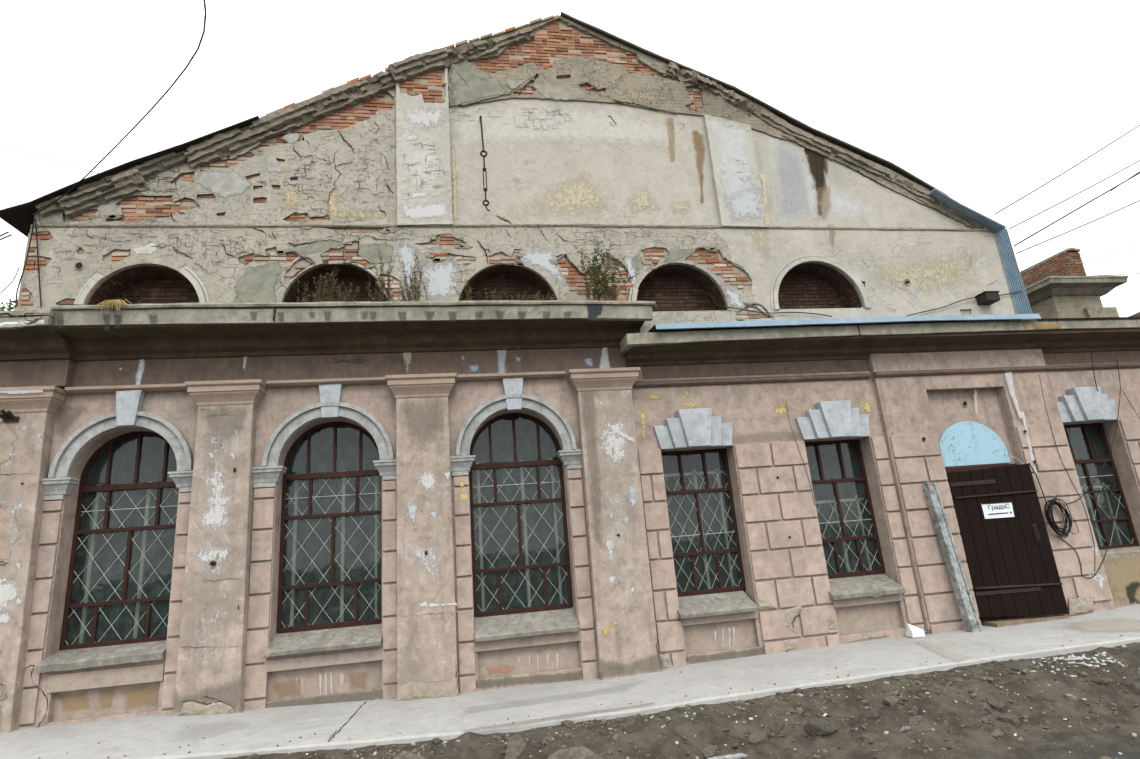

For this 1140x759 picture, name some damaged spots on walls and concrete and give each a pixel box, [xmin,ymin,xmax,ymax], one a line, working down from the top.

spalling [470,20,703,113]
spalling [64,69,450,223]
leakage [805,148,828,214]
spalling [17,231,53,307]
spalling [104,250,131,266]
spalling [239,144,668,302]
spalling [685,246,770,321]
peeling [599,395,658,469]
peeling [194,428,238,574]
peeling [0,502,23,624]
crack [0,665,48,727]